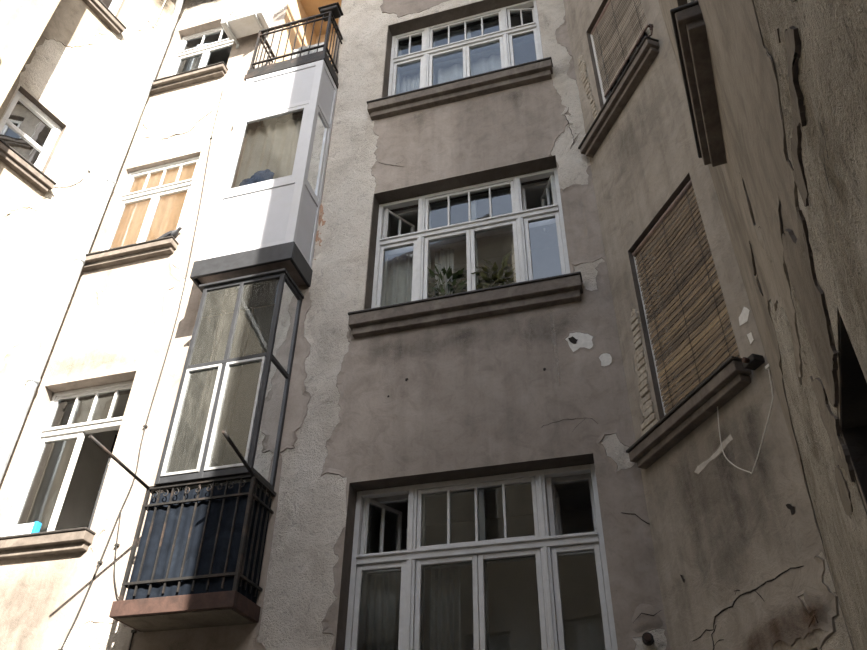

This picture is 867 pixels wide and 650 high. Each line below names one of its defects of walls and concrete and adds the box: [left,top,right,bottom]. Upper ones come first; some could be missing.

flaking render [174,0,241,33]
flaking render [536,0,598,193]
flaking render [0,16,226,376]
flaking render [107,460,123,479]
flaking render [252,0,482,650]
flaking render [570,253,607,295]
flaking render [595,306,658,475]
crack [781,375,827,559]
flaking render [746,0,867,650]
flaking render [57,616,138,650]
flaking render [625,623,671,650]
crack [691,558,804,650]